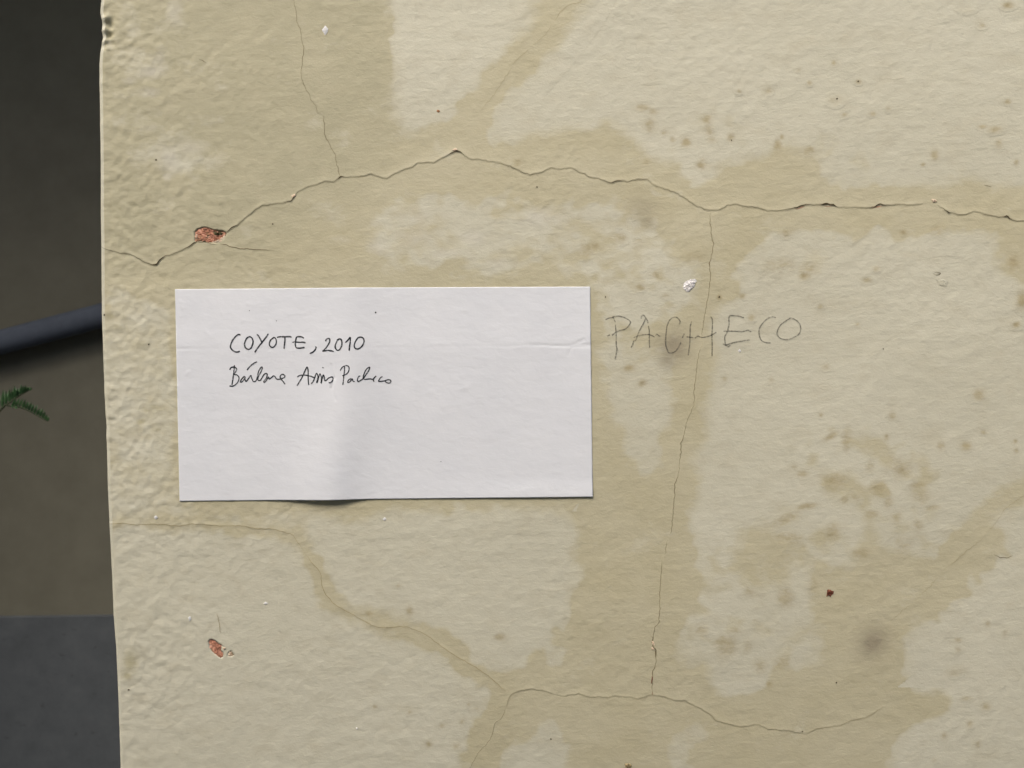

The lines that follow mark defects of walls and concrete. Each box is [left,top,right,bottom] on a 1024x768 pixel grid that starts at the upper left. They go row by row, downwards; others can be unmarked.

spalling [195,227,225,243]
crack [102,5,475,265]
damp [102,0,1024,329]
damp [105,237,1024,768]
spalling [209,640,234,658]